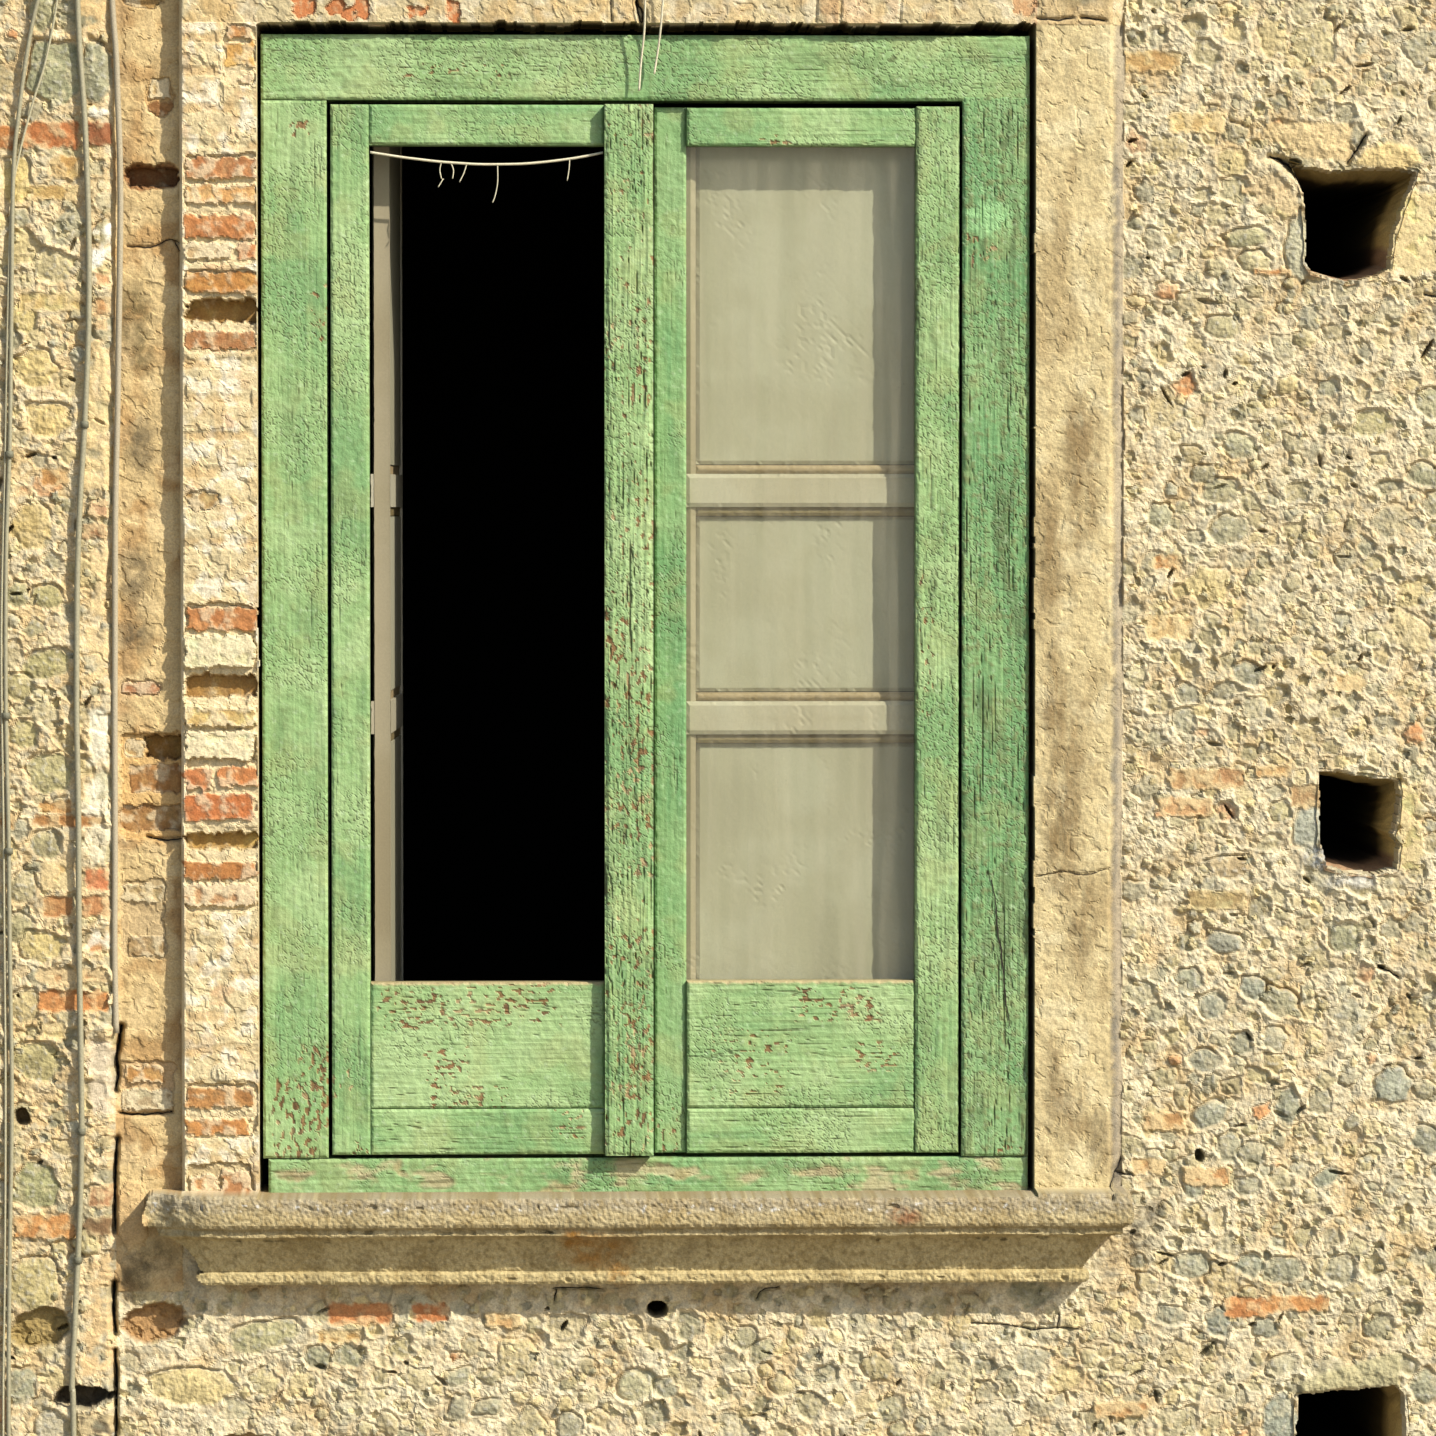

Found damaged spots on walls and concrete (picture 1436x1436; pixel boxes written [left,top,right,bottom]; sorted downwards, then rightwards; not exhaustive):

peeling [292,0,369,21]
peeling [408,6,429,18]
peeling [447,1,460,22]
spalling [124,152,261,351]
spalling [186,490,219,512]
spalling [119,603,263,913]
crack [1036,868,1109,877]
spalling [120,878,167,959]
spalling [187,1162,253,1191]